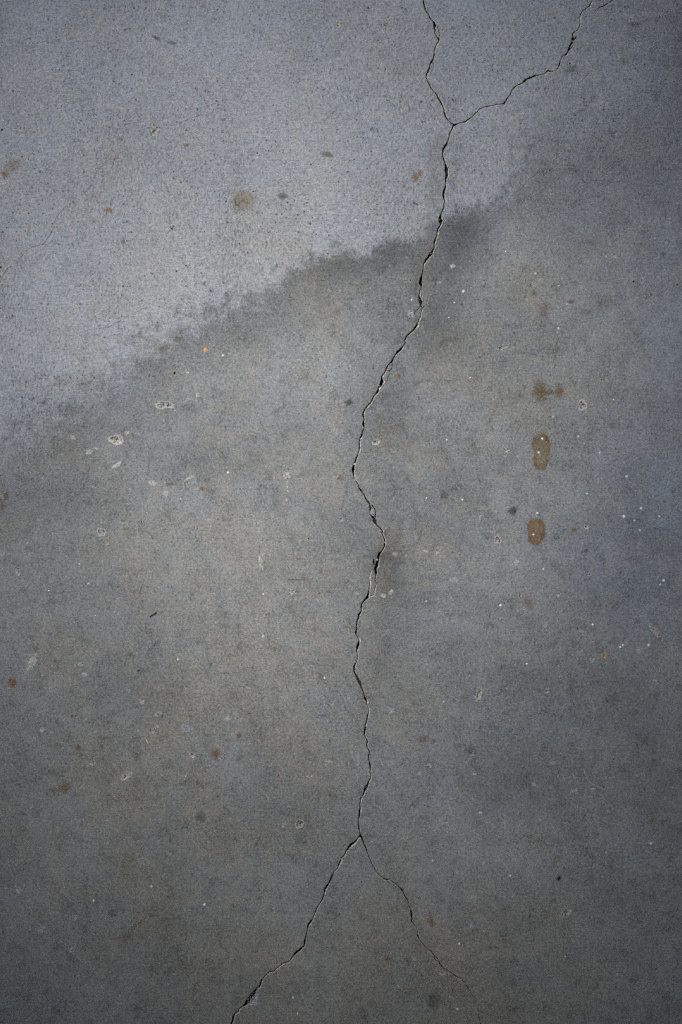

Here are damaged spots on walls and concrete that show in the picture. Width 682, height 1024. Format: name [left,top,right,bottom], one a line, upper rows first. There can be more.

water stain [533,436,549,468]
crack [230,0,613,1024]
water stain [529,519,544,543]